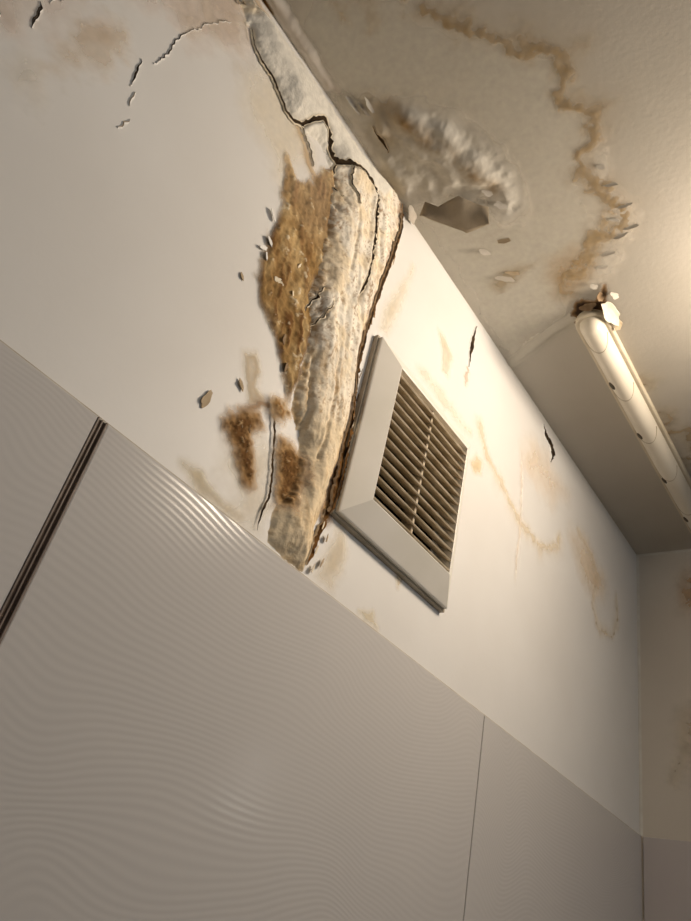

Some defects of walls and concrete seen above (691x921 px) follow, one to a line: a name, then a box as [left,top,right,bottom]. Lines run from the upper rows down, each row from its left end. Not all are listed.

crack [29,0,61,29]
crack [117,0,404,572]
flaking render [258,126,335,402]
water stain [419,4,630,294]
crack [542,424,555,462]